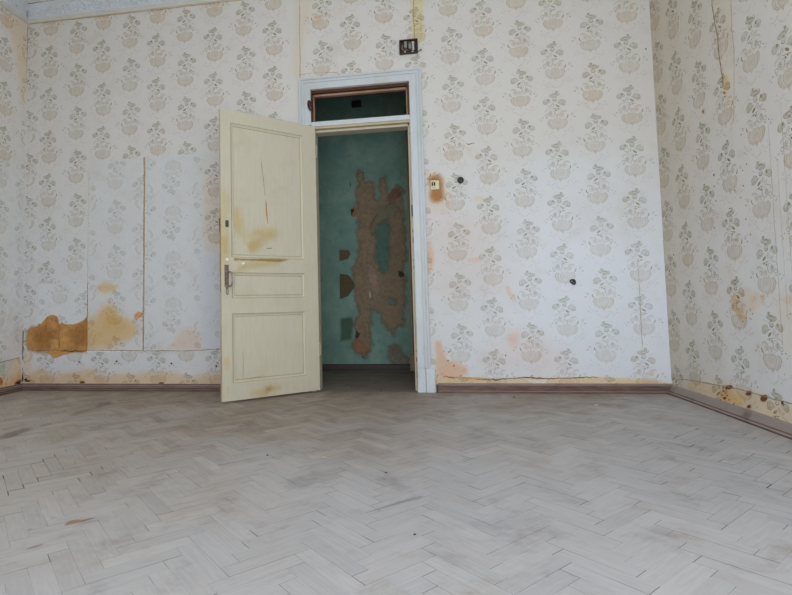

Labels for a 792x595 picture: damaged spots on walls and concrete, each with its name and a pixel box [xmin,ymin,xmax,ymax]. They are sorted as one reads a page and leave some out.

peeling [27,311,88,358]
peeling [339,170,414,356]